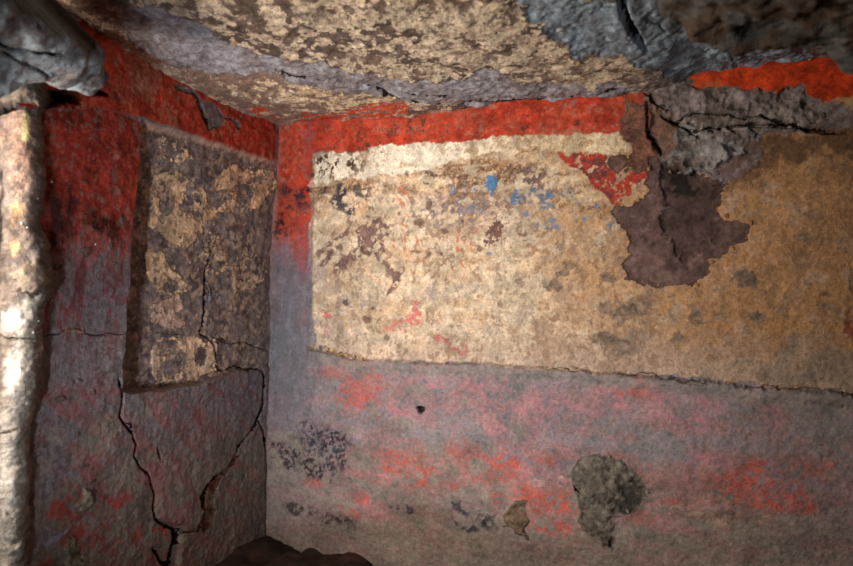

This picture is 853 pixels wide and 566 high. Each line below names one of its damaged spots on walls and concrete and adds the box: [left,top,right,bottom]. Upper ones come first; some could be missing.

spalling [118,0,825,324]
crack [645,93,847,154]
crack [0,241,268,481]
peeling [144,249,218,384]
leakage [270,251,349,478]
crack [118,381,194,566]
spalling [503,499,529,539]